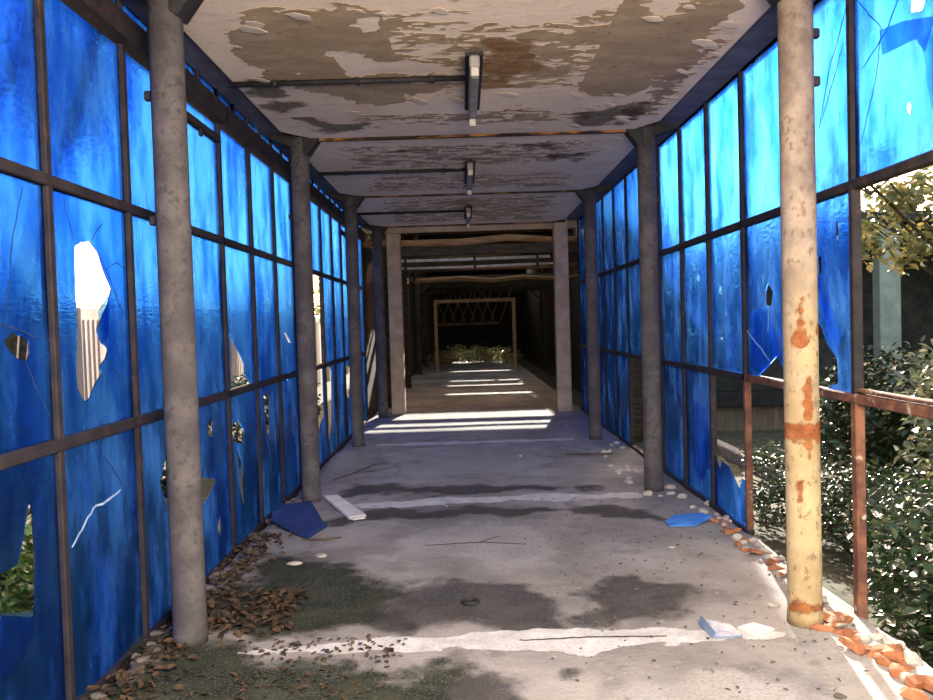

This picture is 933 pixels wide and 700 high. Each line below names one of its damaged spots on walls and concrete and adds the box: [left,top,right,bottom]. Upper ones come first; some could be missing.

peeling [224,0,745,224]
corrosion [791,297,819,348]
corrosion [784,377,933,620]
leakage [371,576,690,632]
leakage [444,674,519,700]